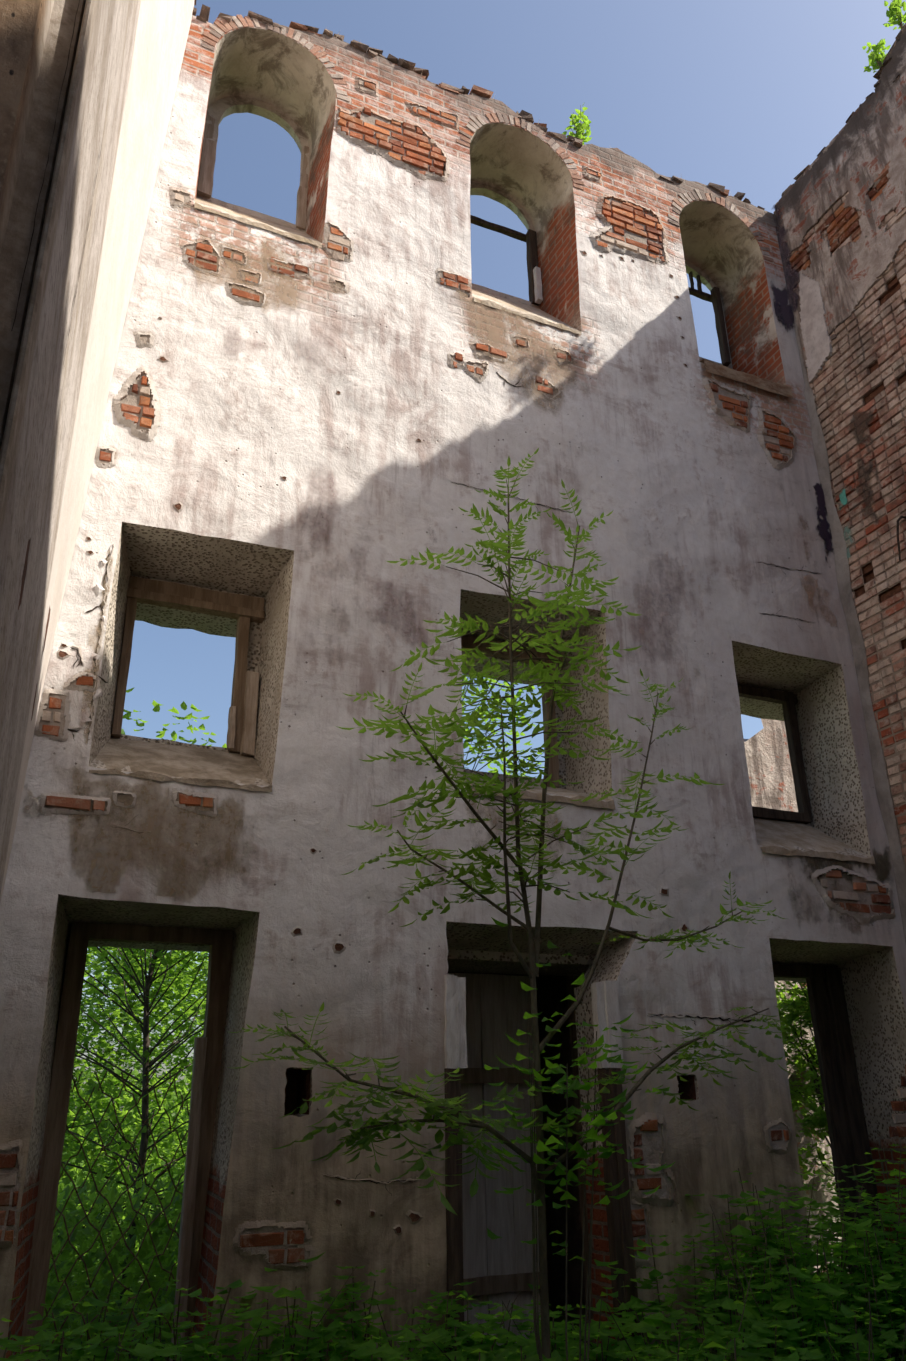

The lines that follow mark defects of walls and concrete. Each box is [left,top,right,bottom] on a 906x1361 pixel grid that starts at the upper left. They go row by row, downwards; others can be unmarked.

spalling [180,237,312,308]
spalling [321,221,355,263]
spalling [329,277,349,293]
spalling [112,332,169,442]
spalling [447,334,532,383]
spalling [701,377,797,471]
spalling [42,598,71,660]
spalling [30,671,96,741]
spalling [37,788,138,817]
water stain [70,768,242,897]
spalling [810,865,896,927]
spalling [232,1219,315,1272]